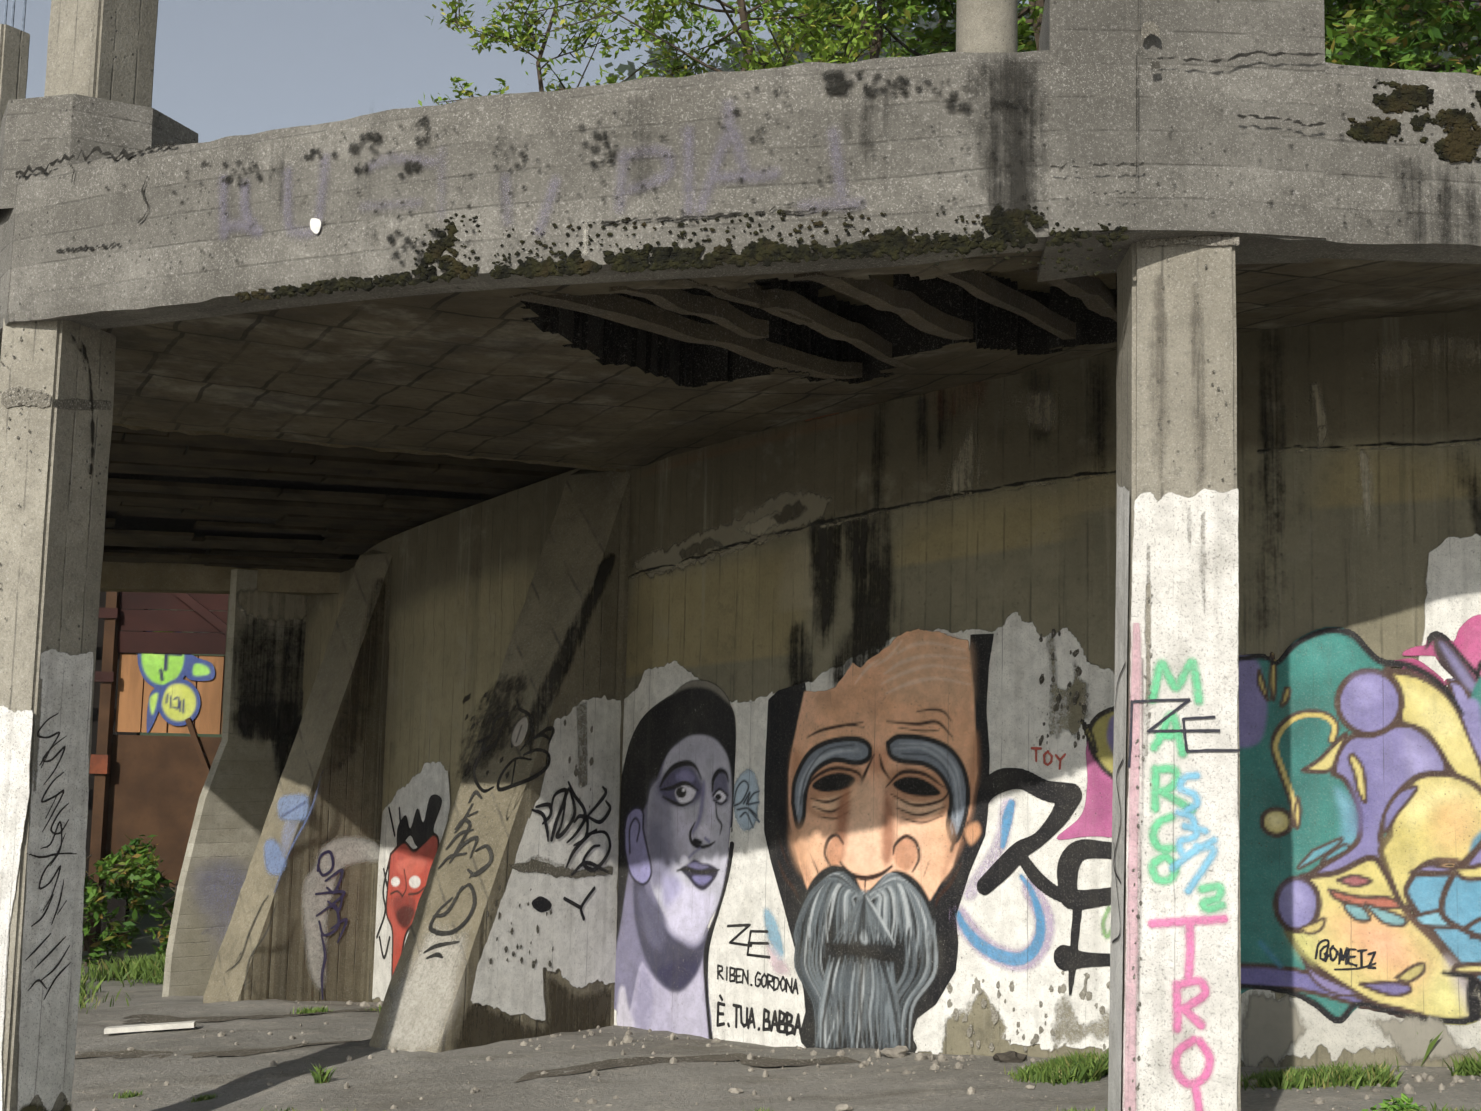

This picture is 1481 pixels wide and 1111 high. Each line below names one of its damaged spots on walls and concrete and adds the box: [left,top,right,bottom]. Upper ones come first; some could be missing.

crack [15,142,176,253]
leakage [976,56,1035,233]
crack [1051,2,1343,195]
spalling [520,272,1117,388]
crack [1257,438,1481,452]
spalling [633,491,832,578]
leakage [789,428,895,686]
crack [629,471,1116,578]
leakage [233,590,308,781]